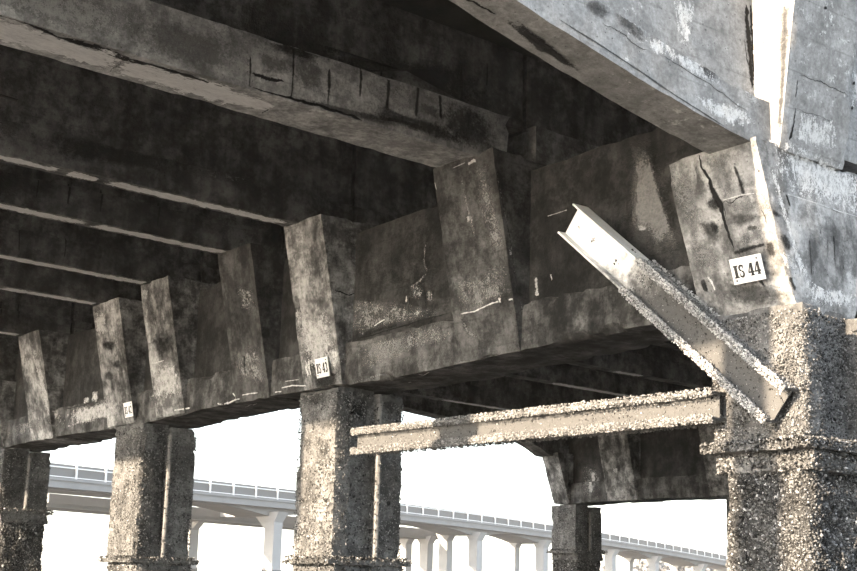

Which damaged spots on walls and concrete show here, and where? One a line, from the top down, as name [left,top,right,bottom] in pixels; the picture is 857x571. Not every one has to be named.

crack [0,15,222,87]
crack [252,73,362,121]
crack [561,20,748,125]
water stain [695,91,759,126]
crack [744,5,754,88]
crack [699,155,734,248]